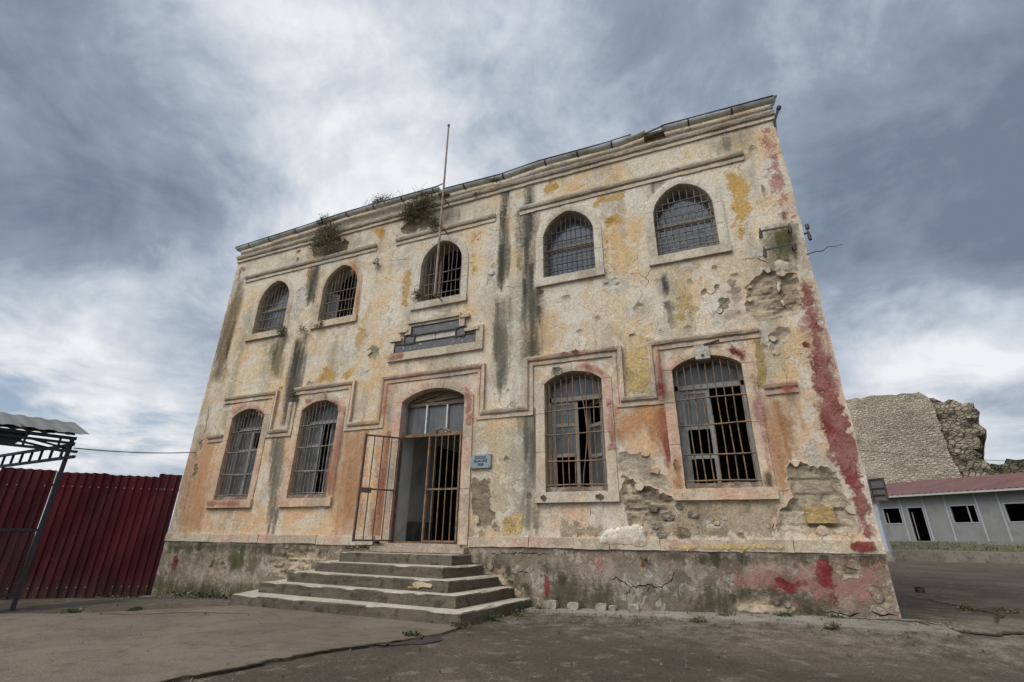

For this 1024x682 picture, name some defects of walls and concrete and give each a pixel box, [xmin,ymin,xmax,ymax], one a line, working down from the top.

leakage [494,187,543,389]
leakage [272,339,306,423]
spalling [606,250,876,614]
spalling [468,476,524,537]
crack [607,573,674,594]